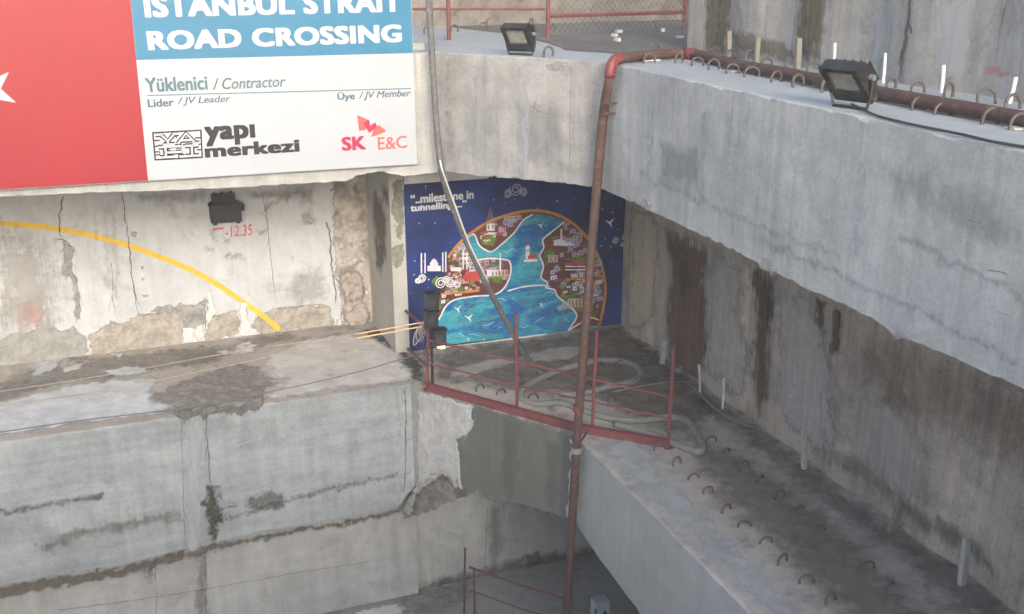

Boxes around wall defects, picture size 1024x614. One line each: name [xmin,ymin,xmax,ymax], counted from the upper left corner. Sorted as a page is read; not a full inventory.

leakage [733,7,808,61]
crack [898,0,912,78]
crack [27,192,159,333]
spalling [0,174,373,366]
crack [202,404,211,483]
leakage [0,291,423,598]
peeling [404,391,474,519]
leakage [434,208,1006,614]